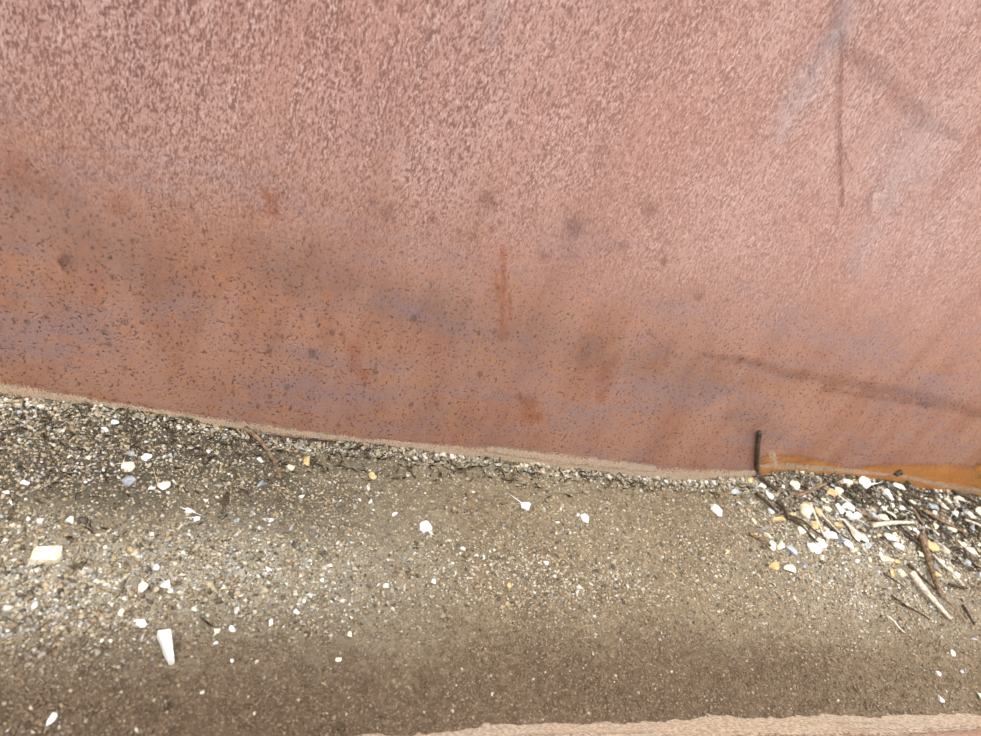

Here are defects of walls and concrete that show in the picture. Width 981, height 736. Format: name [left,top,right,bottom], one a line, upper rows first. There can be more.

rust [756,456,981,496]